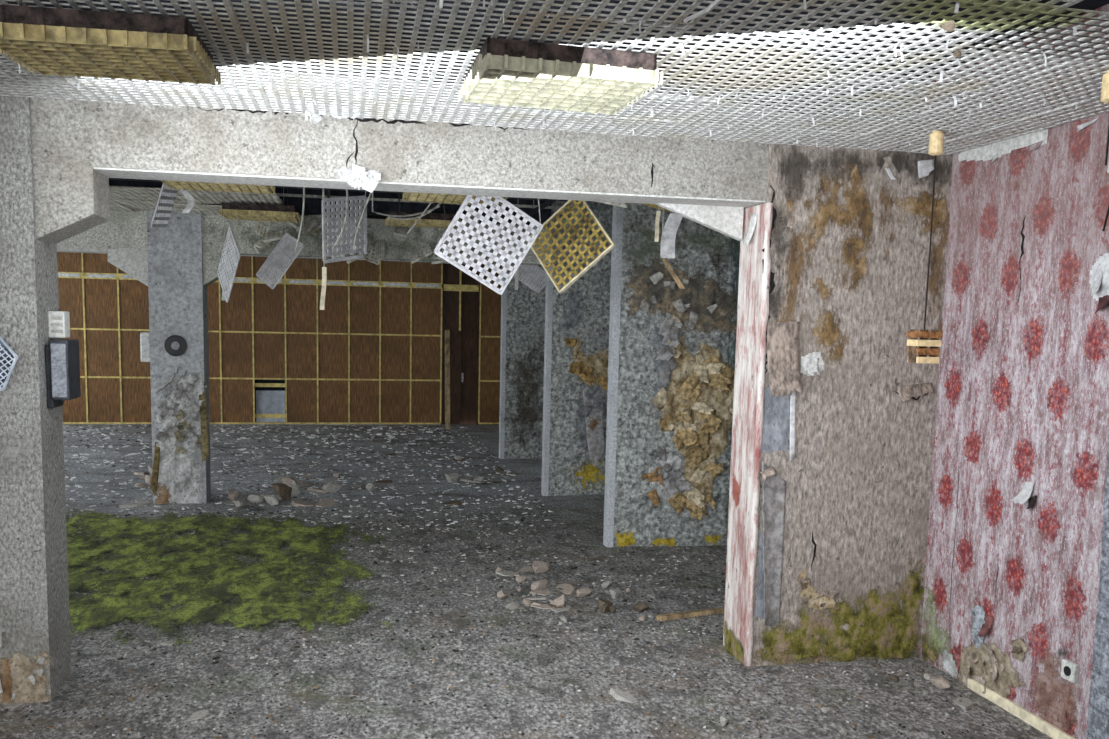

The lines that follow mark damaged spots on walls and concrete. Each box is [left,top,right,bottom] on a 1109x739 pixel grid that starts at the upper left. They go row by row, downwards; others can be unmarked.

crack [197,107,527,167]
peeling [743,213,757,245]
water stain [769,148,951,365]
peeling [150,367,209,504]
water stain [504,338,544,445]
flaking render [559,289,609,462]
flaking render [625,257,740,521]
spalling [0,650,52,704]
spalling [942,604,1080,739]